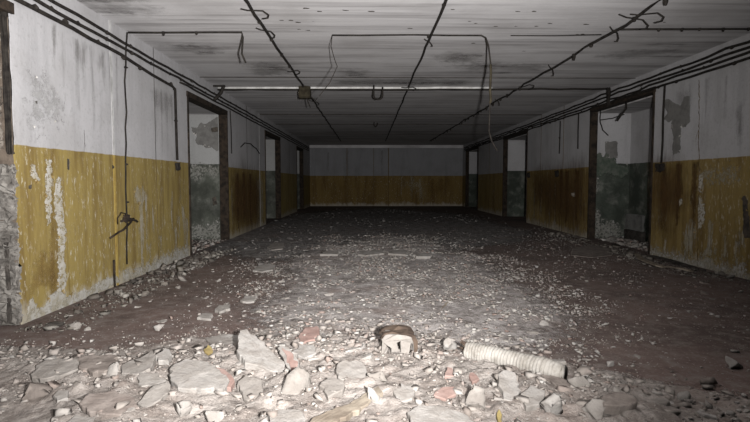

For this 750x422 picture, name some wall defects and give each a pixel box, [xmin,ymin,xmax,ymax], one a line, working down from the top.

spalling [0,12,24,325]
peeling [29,159,67,295]
peeling [191,117,219,151]
peeling [664,96,690,155]